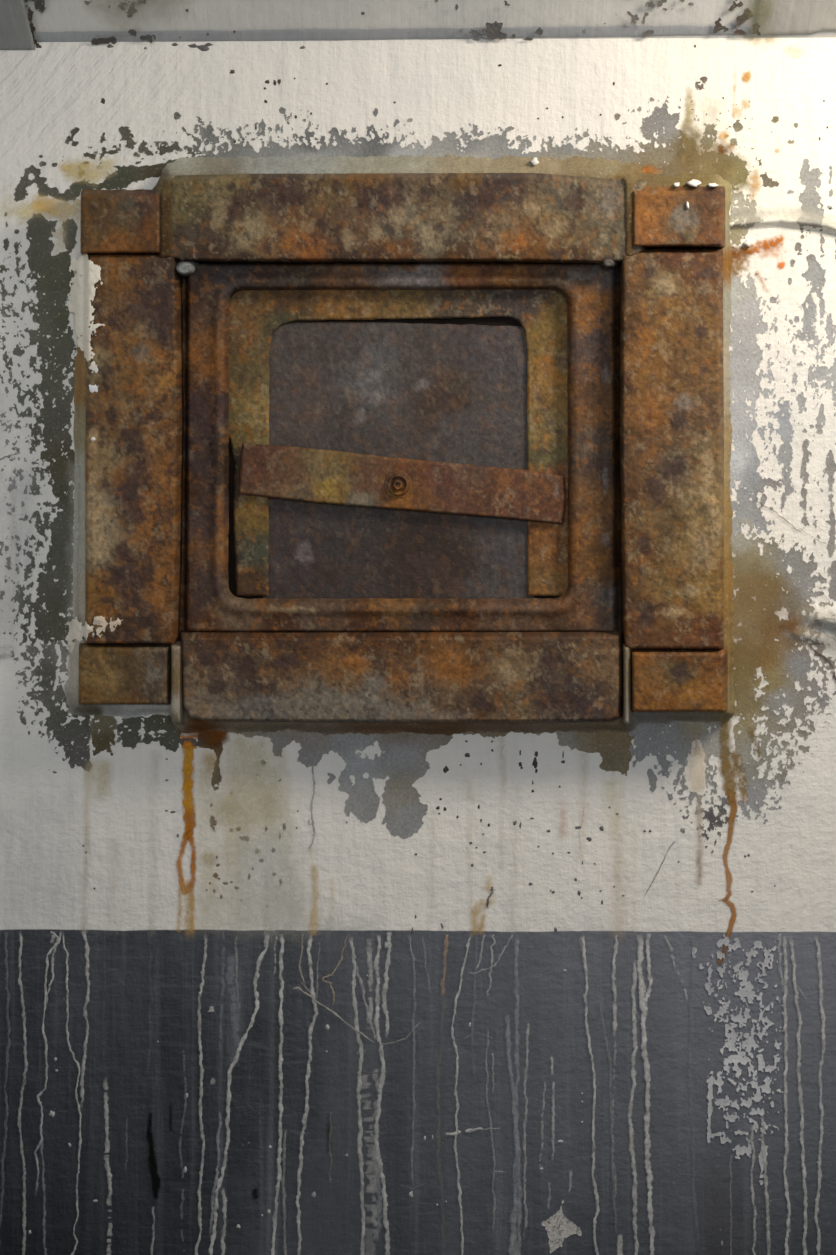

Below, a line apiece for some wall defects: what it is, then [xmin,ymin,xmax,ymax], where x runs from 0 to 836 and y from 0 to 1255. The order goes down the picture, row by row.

peeling [457,21,543,41]
peeling [713,0,761,36]
corrosion [731,237,783,274]
peeling [0,76,836,901]
corrosion [177,730,227,929]
corrosion [717,718,746,965]
leakage [4,931,90,1255]
leakage [182,904,284,1255]
leakage [296,932,391,1255]
leakage [603,934,655,1255]
peeling [692,934,784,1185]
leakage [778,937,826,1255]